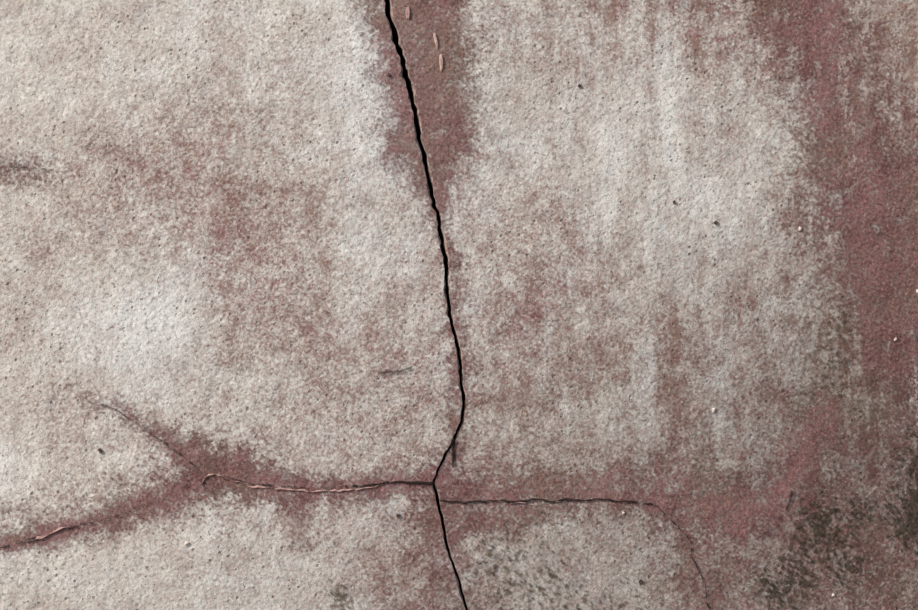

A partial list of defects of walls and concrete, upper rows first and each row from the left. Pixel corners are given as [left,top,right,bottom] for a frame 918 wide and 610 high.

crack [0,508,135,548]
crack [88,0,710,610]
damp [361,0,479,339]
damp [0,320,918,610]
damp [757,0,918,380]